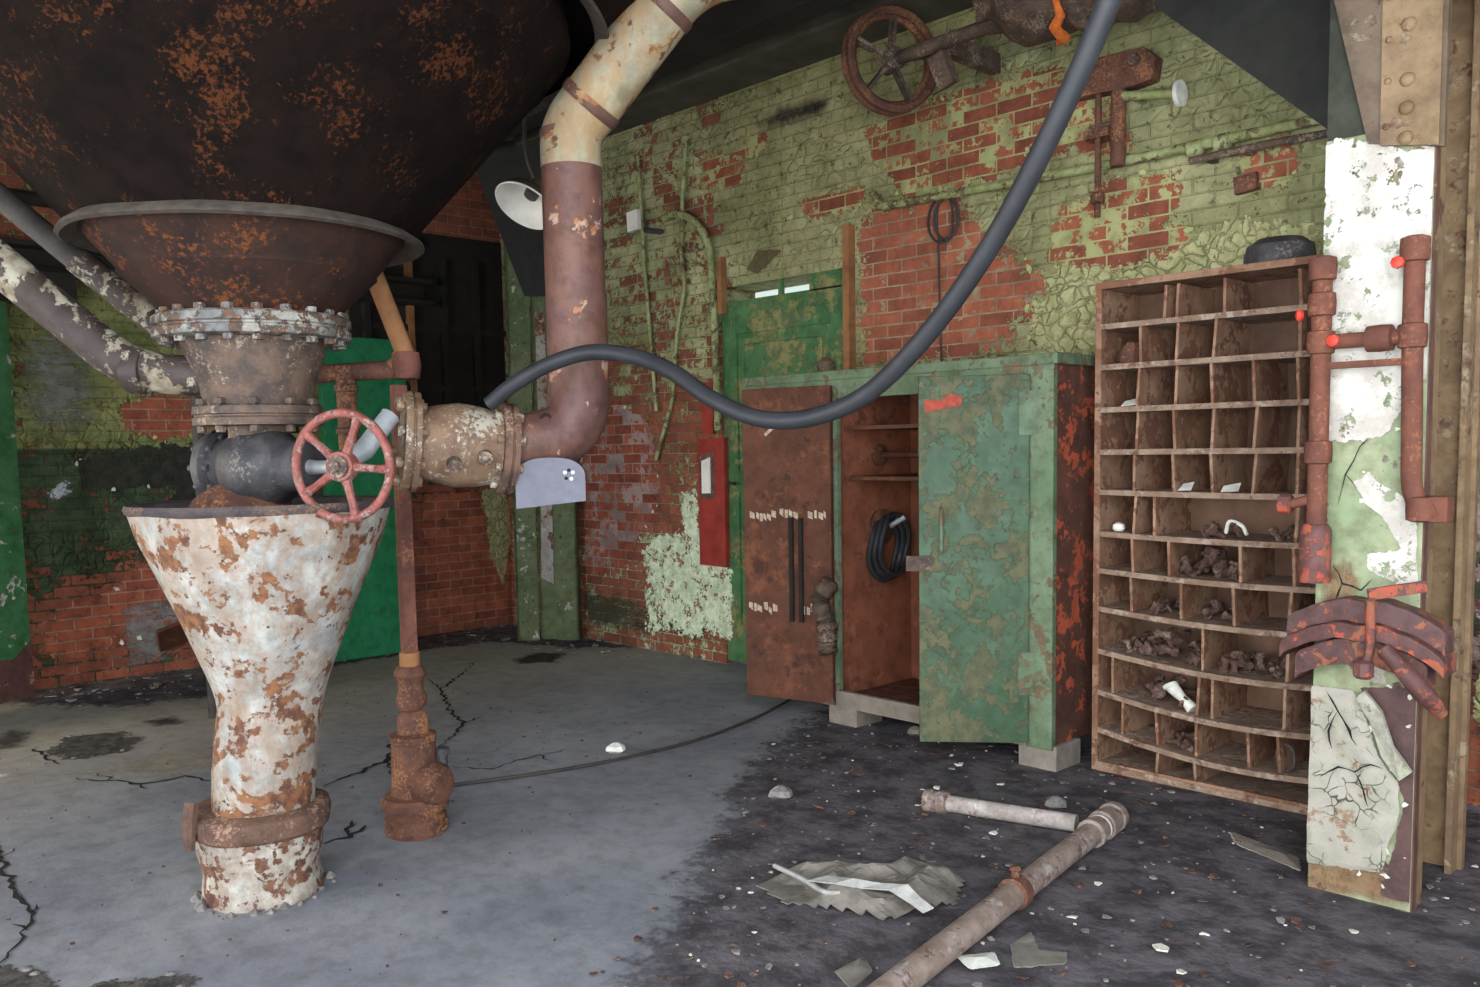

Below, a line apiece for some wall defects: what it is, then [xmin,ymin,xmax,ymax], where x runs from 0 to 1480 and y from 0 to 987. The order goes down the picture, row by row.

peeling [786,61,1067,368]
peeling [915,169,1203,364]
peeling [1323,138,1434,443]
peeling [47,394,196,501]
peeling [580,401,735,643]
peeling [1353,471,1419,584]
peeling [35,559,178,659]
crack [323,820,366,844]
crack [323,744,391,787]
crack [1321,691,1382,807]
peeling [1356,684,1416,903]
crack [0,848,38,967]